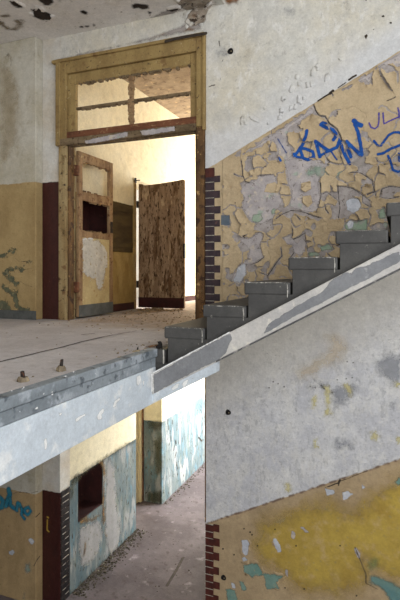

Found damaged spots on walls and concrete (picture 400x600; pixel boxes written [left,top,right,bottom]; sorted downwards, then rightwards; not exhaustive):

spalling [9,0,57,20]
peeling [132,0,213,40]
peeling [222,52,400,302]
peeling [82,238,108,291]
water stain [154,440,163,473]
peeling [79,461,120,565]
water stain [147,491,162,503]
peeling [226,477,400,600]